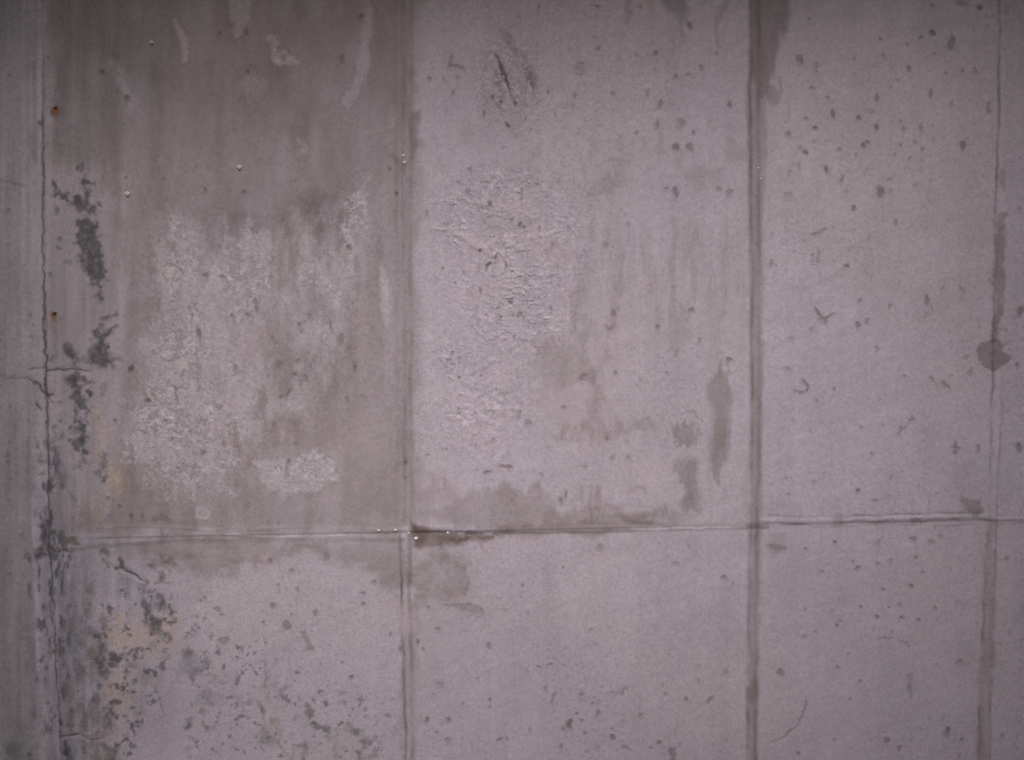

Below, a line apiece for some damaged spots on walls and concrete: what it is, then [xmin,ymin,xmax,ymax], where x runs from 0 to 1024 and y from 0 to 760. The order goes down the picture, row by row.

crack [0,113,102,741]
leakage [2,0,807,760]
leakage [976,209,1017,373]